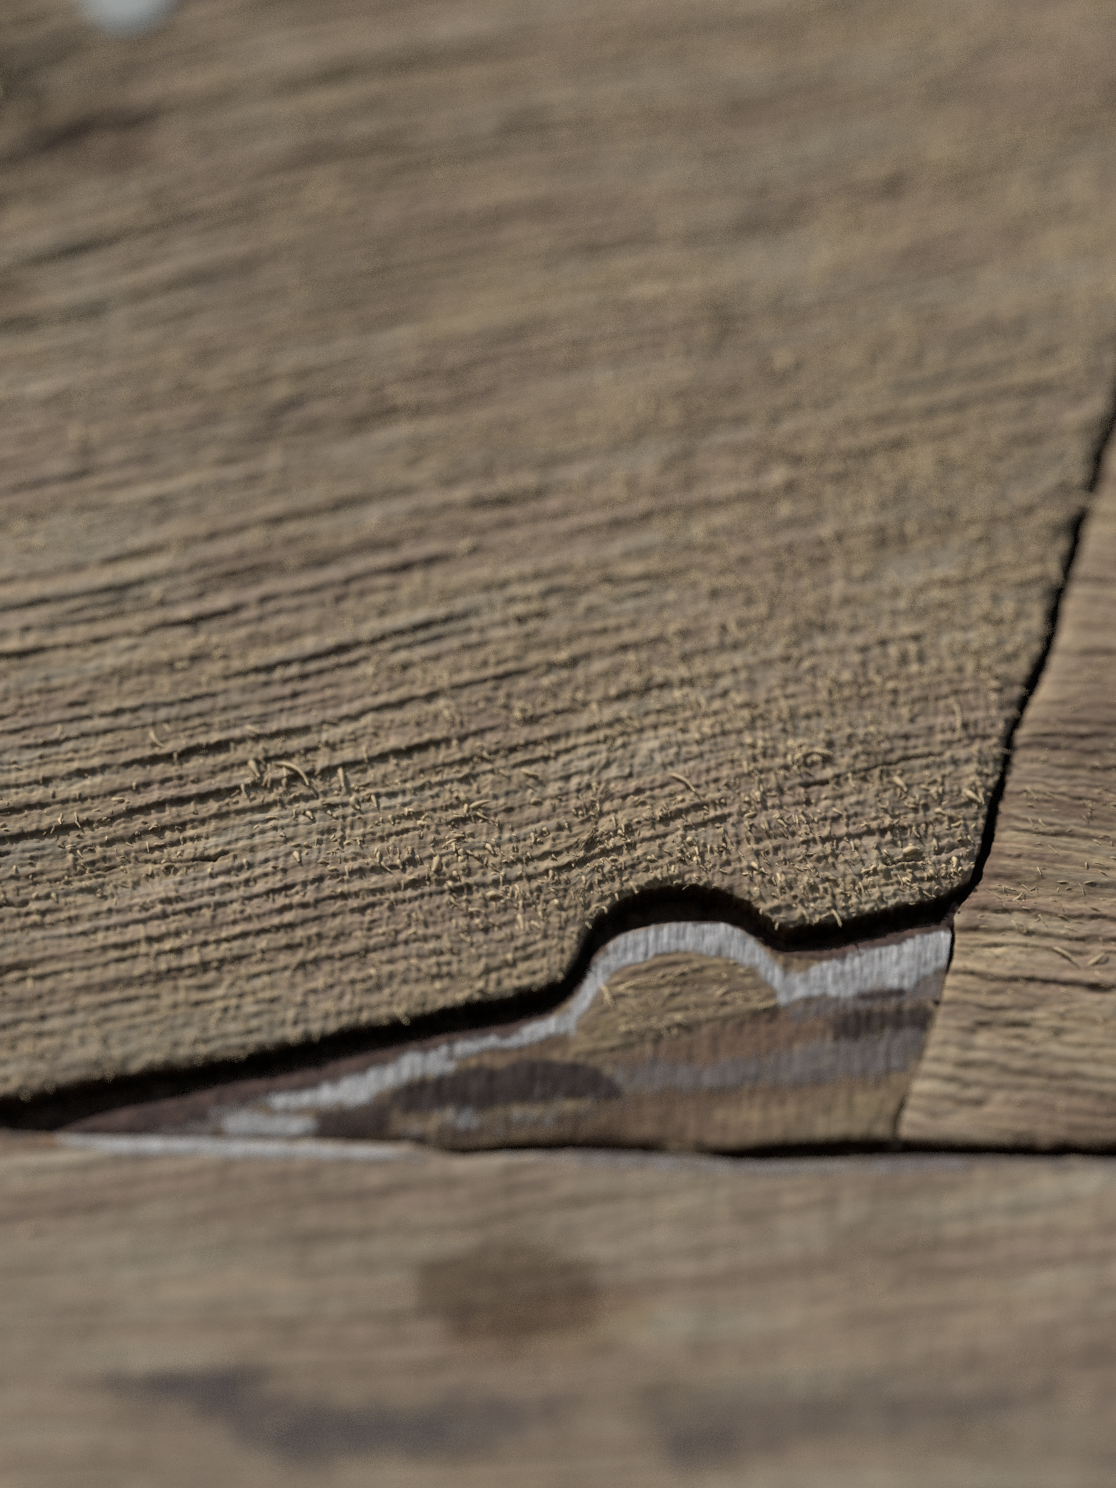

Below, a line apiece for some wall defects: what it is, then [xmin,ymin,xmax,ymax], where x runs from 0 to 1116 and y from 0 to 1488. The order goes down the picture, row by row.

crack [0,389,1116,1136]
peeling [57,923,951,1160]
crack [451,1150,649,1158]
crack [710,1072,1116,1164]